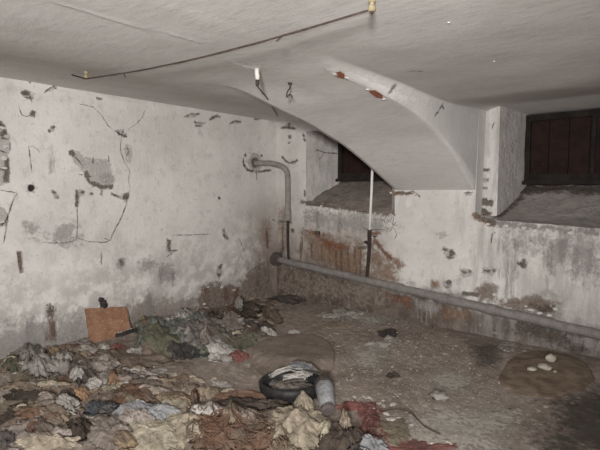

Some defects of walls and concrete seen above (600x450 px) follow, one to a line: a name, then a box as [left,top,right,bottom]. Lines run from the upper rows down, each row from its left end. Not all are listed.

spalling [0,121,11,185]
crack [1,190,17,244]
crack [43,118,130,262]
spalling [68,150,129,207]
rust [301,228,403,282]
water stain [0,312,80,355]